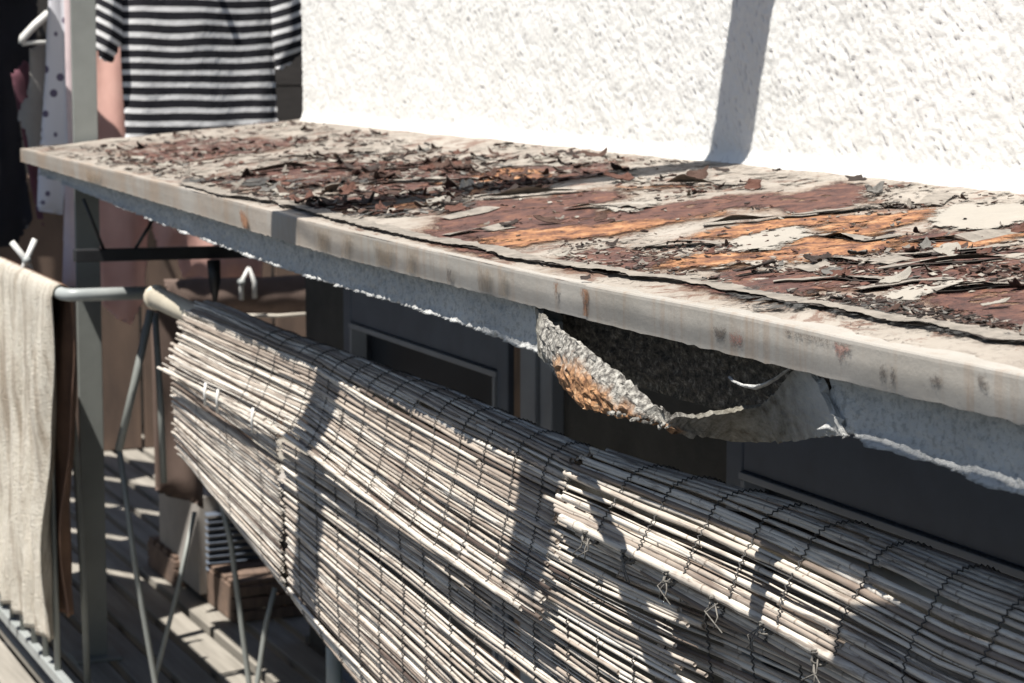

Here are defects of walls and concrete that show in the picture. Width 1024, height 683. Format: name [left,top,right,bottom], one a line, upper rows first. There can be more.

peeling [31,120,1024,335]
corrosion [209,161,1024,332]
flaking render [535,307,851,444]